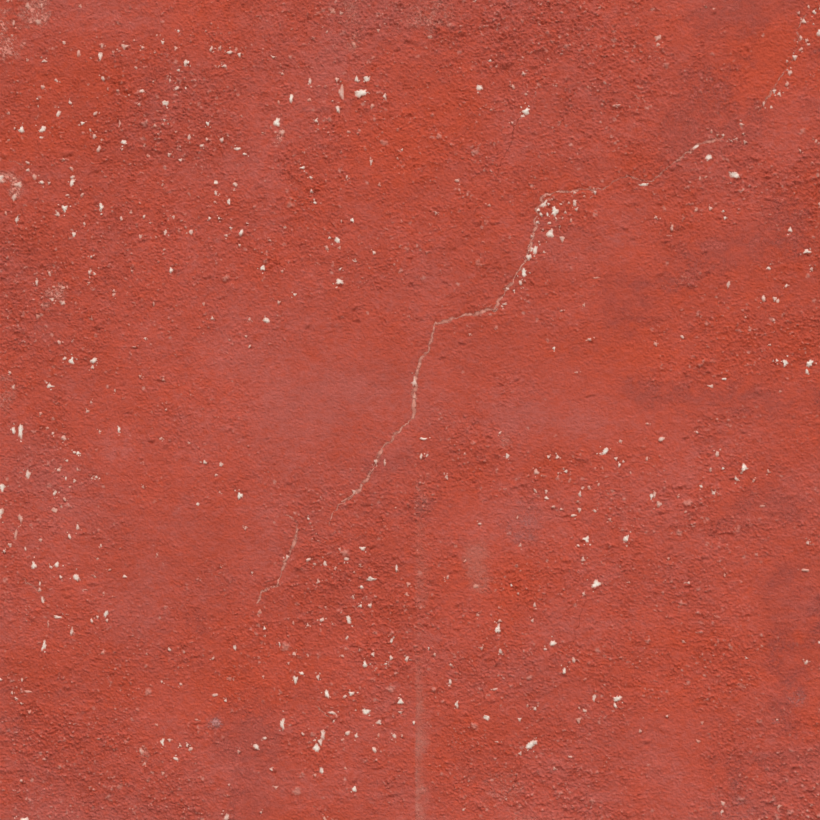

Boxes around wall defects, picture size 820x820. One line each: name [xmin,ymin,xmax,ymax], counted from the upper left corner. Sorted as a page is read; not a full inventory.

crack [626,137,723,182]
crack [329,187,606,524]
crack [256,515,298,604]